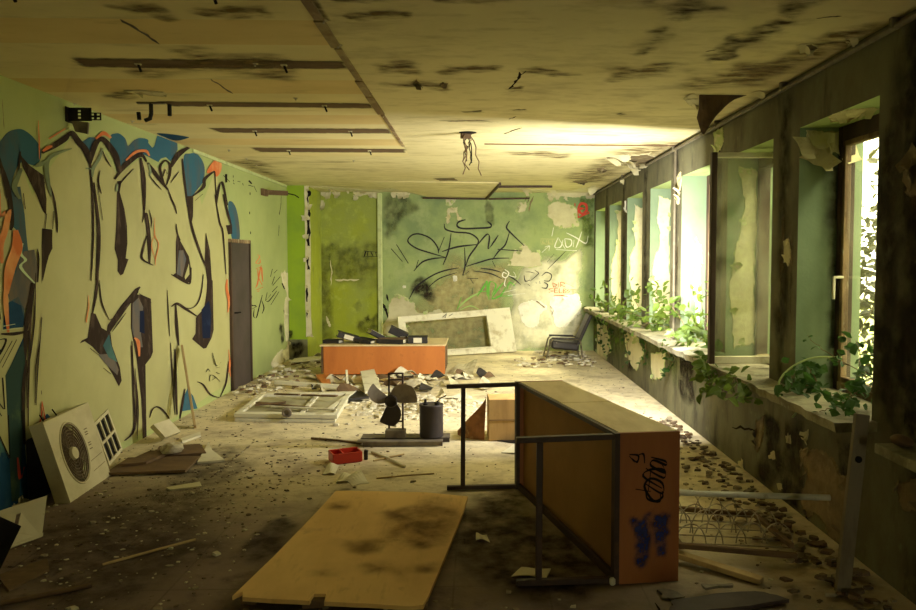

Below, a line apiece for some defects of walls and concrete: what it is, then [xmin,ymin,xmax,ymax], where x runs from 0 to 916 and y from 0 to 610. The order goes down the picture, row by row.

leakage [74,51,346,78]
leakage [199,0,268,18]
leakage [345,11,411,19]
leakage [690,3,870,87]
peeling [793,107,879,171]
spalling [515,180,602,229]
leakage [408,263,507,349]
flaking render [691,236,704,326]
flaking render [729,166,758,350]
peeling [595,324,612,361]
peeling [624,332,666,380]
leakage [758,417,803,509]